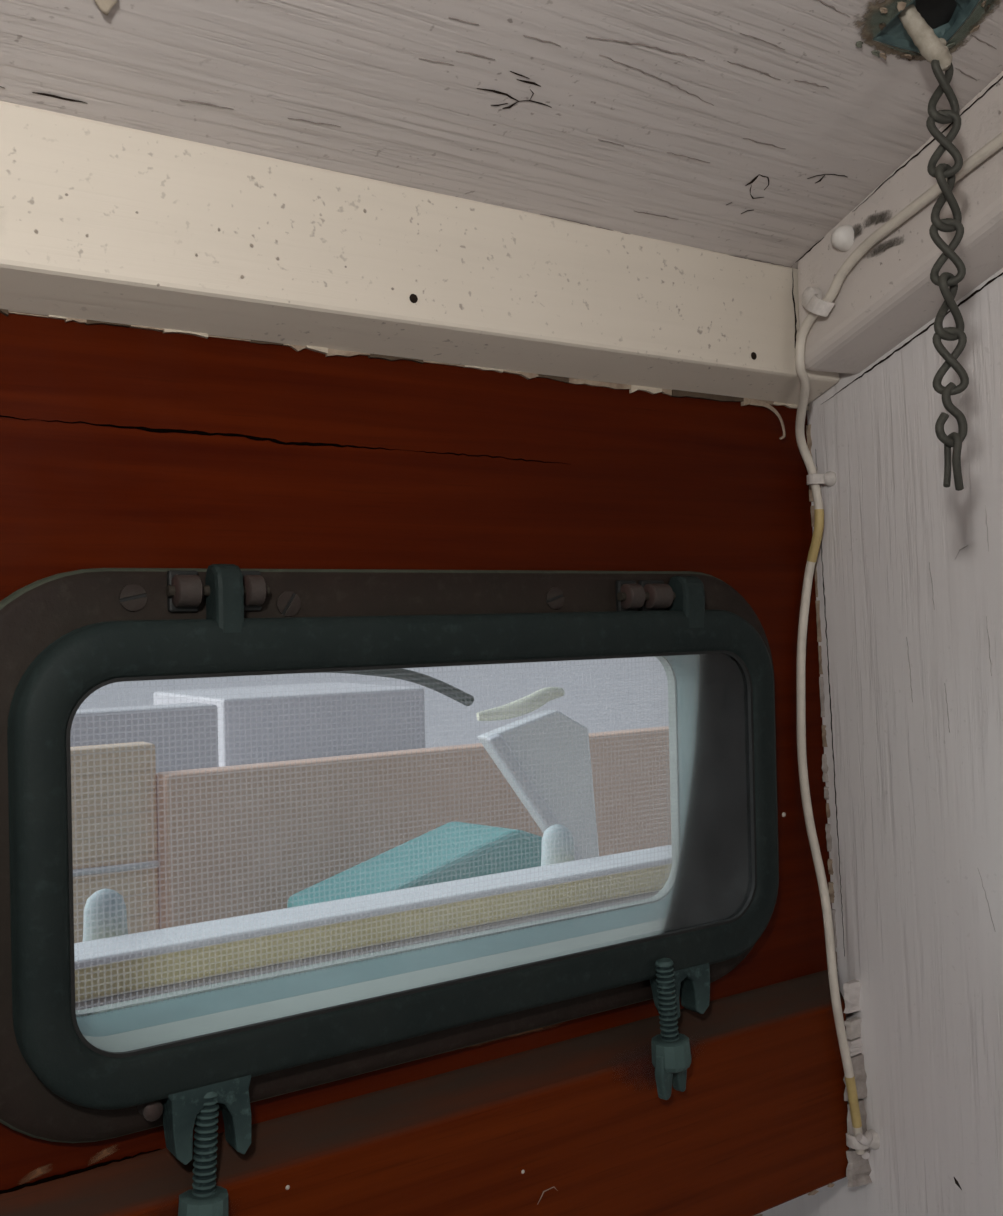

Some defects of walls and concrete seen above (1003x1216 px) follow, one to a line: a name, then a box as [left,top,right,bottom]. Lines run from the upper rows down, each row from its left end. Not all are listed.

peeling [855,0,926,61]
peeling [946,0,1001,54]
crack [419,17,552,109]
crack [0,415,566,464]